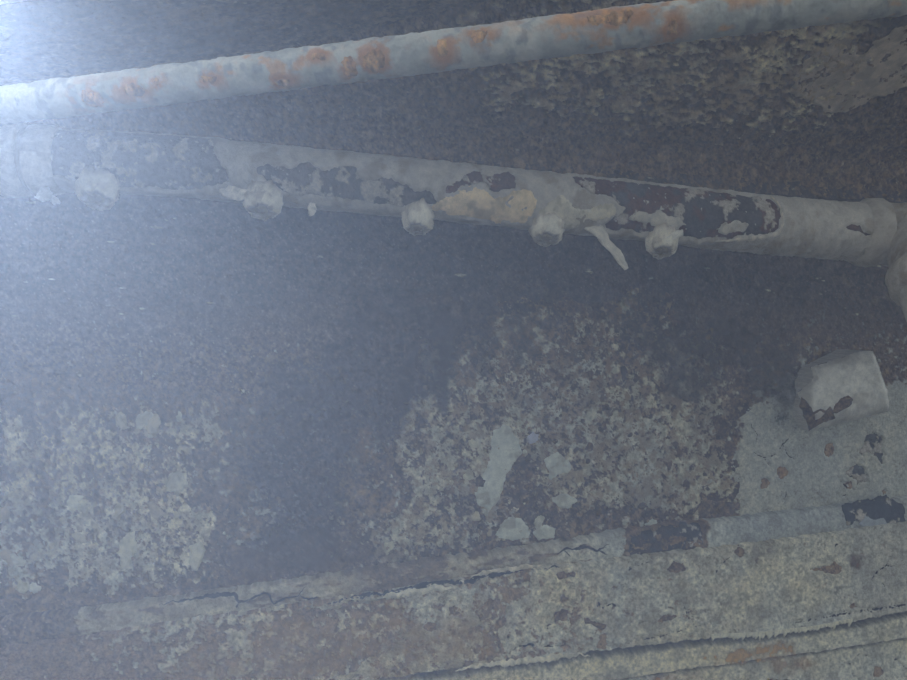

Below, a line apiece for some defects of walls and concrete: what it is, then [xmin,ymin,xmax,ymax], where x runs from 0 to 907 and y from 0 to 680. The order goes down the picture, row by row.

peeling [792,25,907,113]
peeling [254,162,437,216]
peeling [446,171,516,193]
peeling [573,176,784,270]
peeling [349,286,751,565]
rust [799,395,853,430]
peeling [0,364,250,602]
peeling [846,433,883,484]
crack [532,544,609,570]
rust [628,521,703,555]
crack [159,587,316,608]